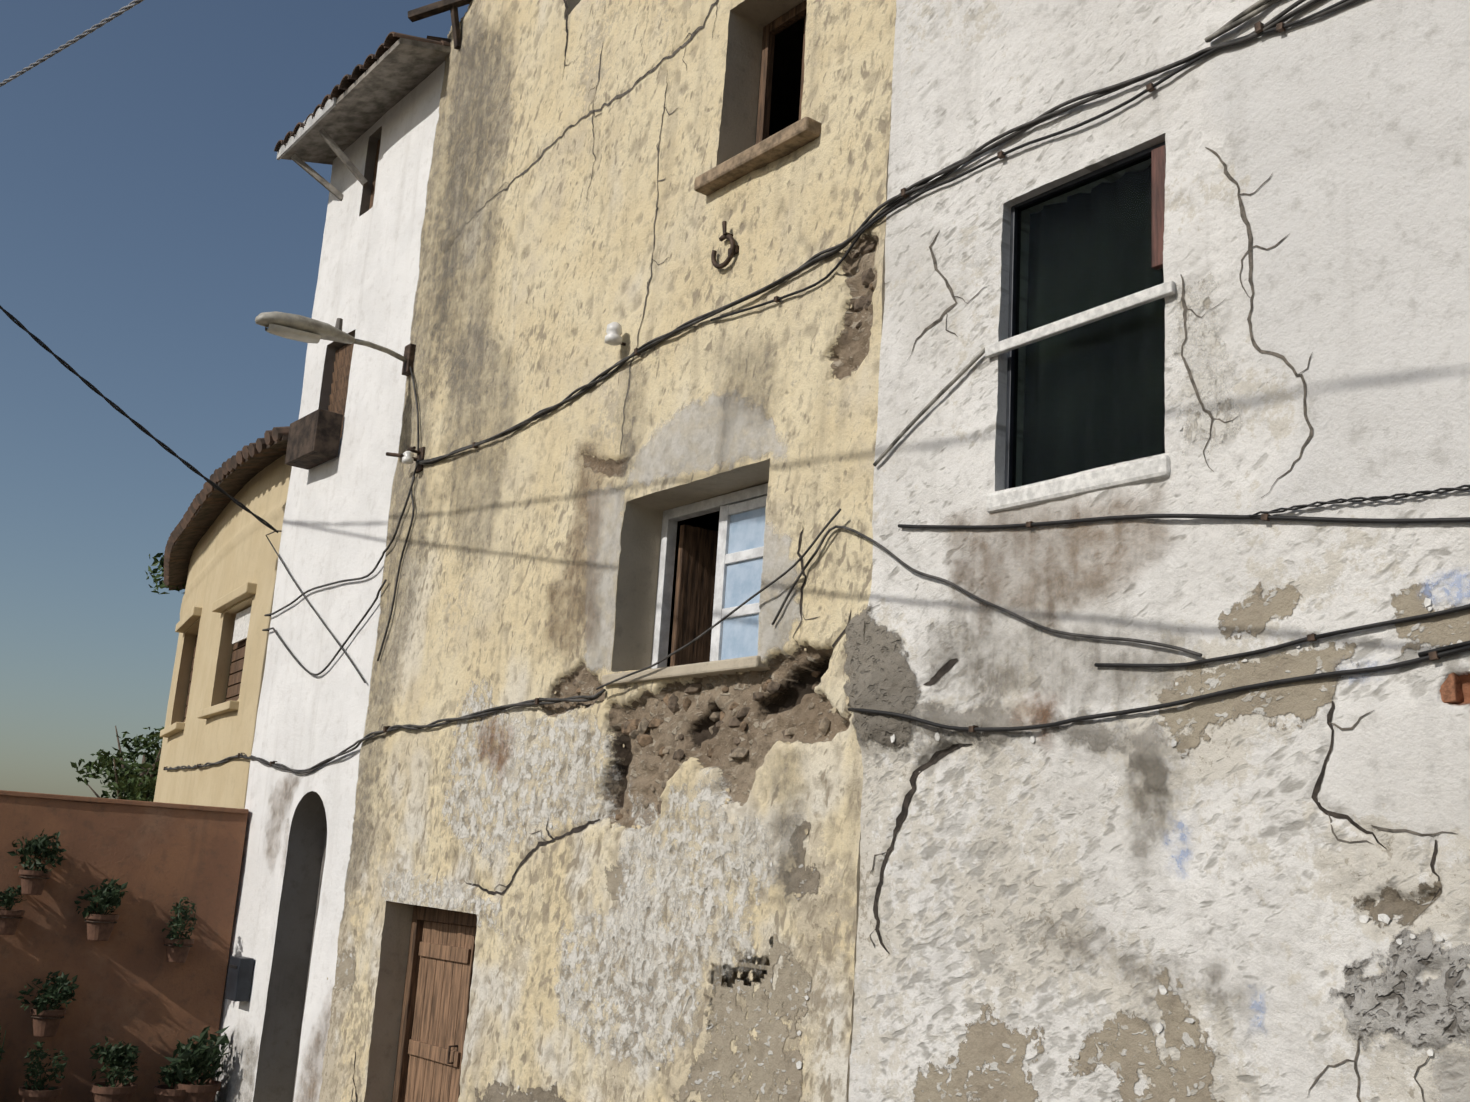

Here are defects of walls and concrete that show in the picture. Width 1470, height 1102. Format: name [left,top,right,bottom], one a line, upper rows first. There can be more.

crack [448,0,718,495]
spalling [830,234,879,380]
crack [1181,147,1313,498]
peeling [1156,642,1359,759]
peeling [1391,582,1470,656]
spalling [1439,669,1470,705]
crack [466,817,600,906]
spalling [442,645,852,1102]
crack [870,743,972,954]
crack [1311,701,1457,902]
peeling [913,1004,1045,1102]
peeling [1068,967,1225,1102]